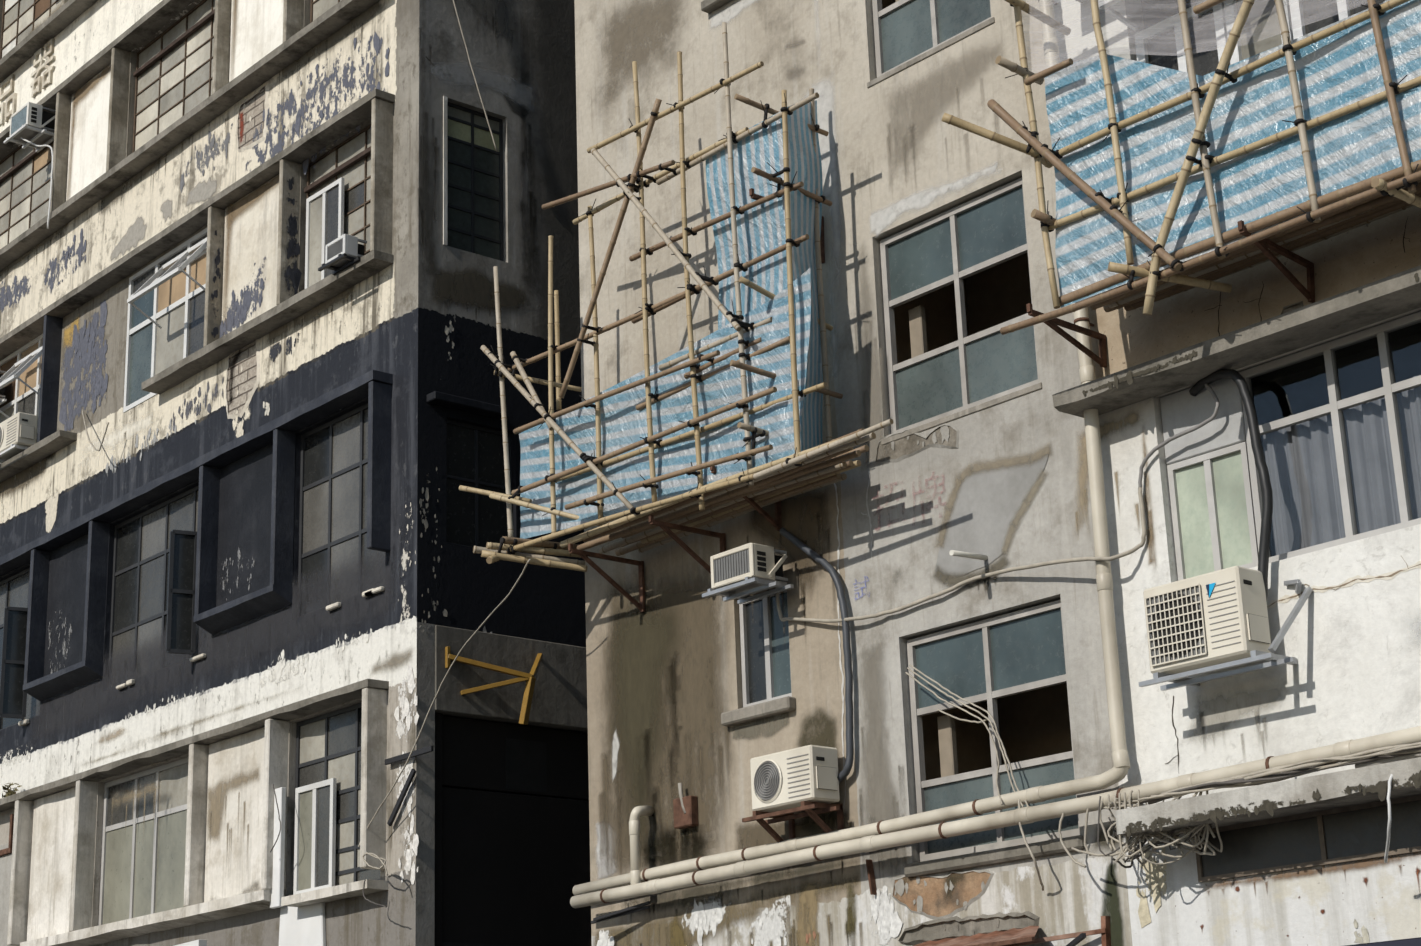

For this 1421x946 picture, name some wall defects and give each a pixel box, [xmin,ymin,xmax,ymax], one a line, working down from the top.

damp [605,0,678,101]
peeling [180,32,389,193]
peeling [0,228,86,314]
flaking render [105,333,300,475]
crack [1267,556,1421,609]
damp [595,581,862,946]
damp [861,649,897,824]
peeling [681,896,726,946]
peeling [751,895,791,946]
damp [869,846,905,884]
flaking render [870,869,1040,946]
spalling [1123,789,1322,928]